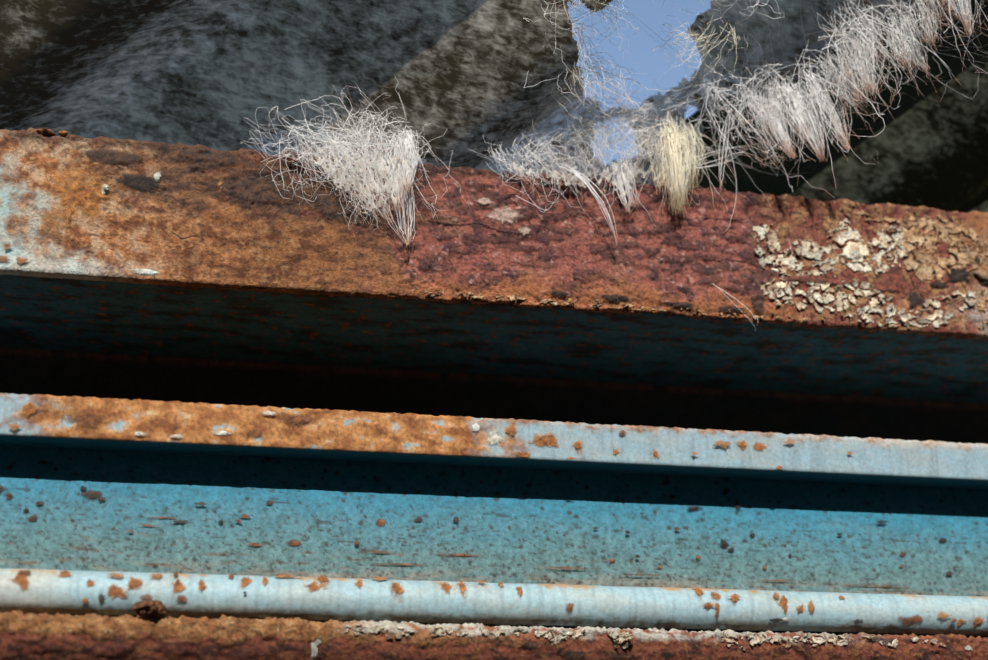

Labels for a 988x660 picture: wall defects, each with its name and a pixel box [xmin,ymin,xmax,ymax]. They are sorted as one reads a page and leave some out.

rust [177,147,366,221]
rust [839,203,988,283]
peeling [718,218,925,313]
crack [902,242,988,317]
spalling [929,255,980,288]
spalling [602,294,630,303]
rust [845,288,988,328]
rust [515,433,559,458]
rust [12,570,31,590]
rust [82,573,162,603]
rust [228,573,328,594]
rust [773,592,815,613]